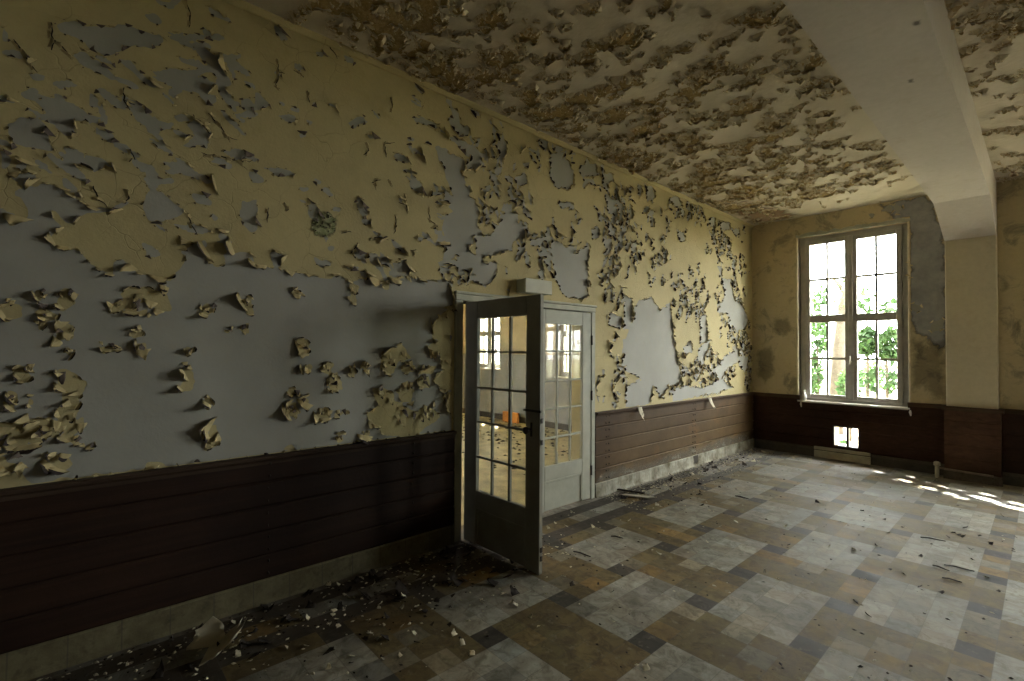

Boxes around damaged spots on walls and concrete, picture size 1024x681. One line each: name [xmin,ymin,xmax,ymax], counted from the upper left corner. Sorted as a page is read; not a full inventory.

peeling [945,0,1024,176]
mould [311,212,336,237]
peeling [0,0,908,483]